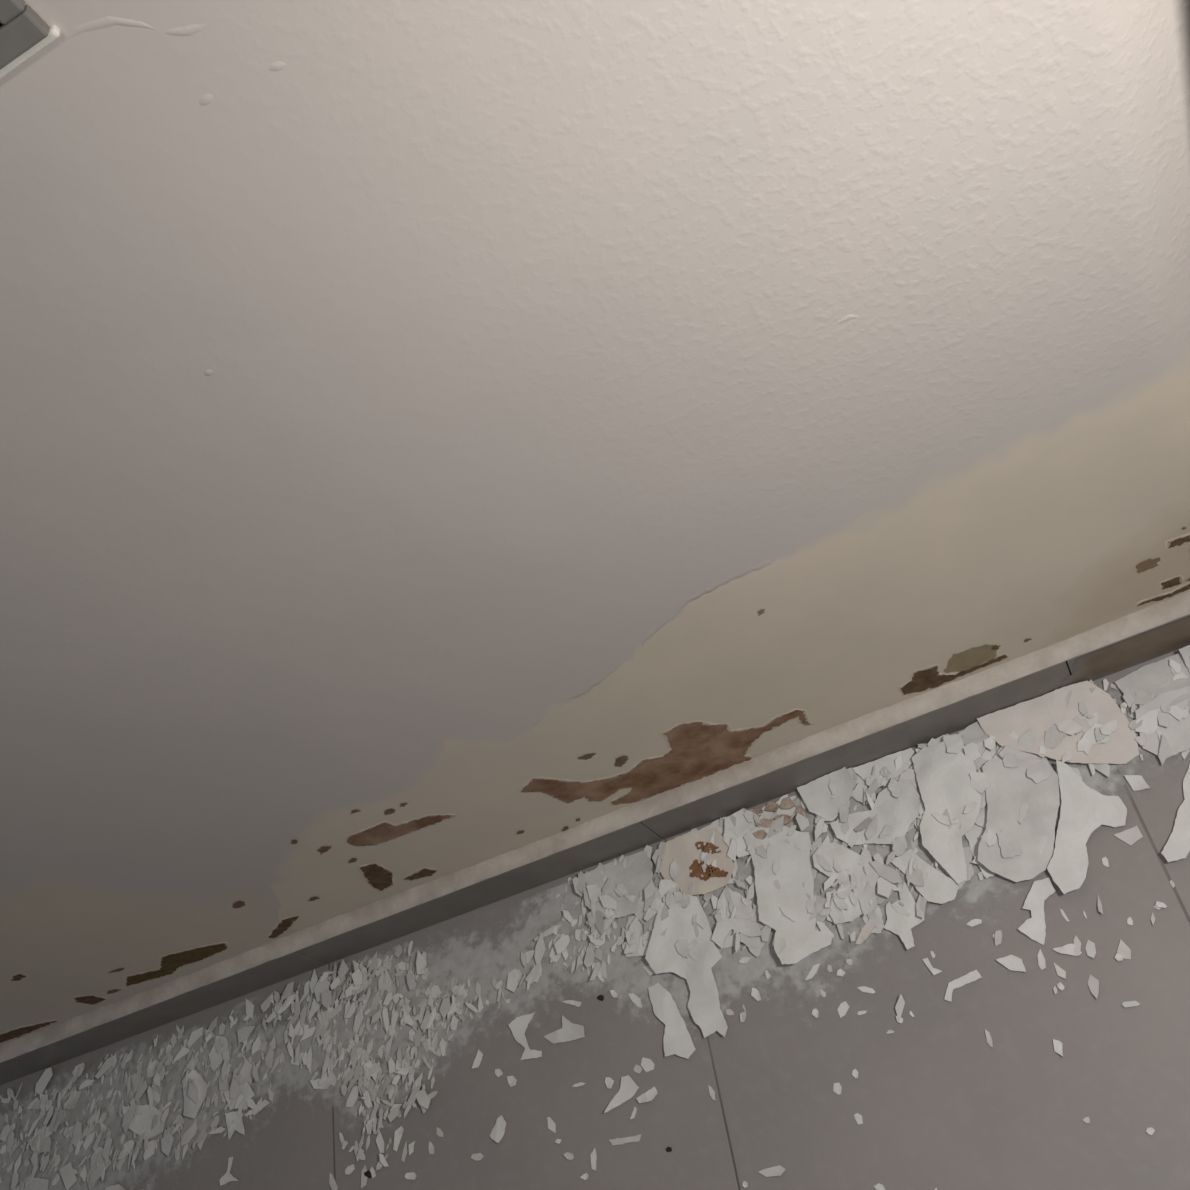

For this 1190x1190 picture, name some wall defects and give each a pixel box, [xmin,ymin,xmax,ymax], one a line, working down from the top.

peeling [72,334,1190,1005]
damp [944,501,1190,673]
spalling [0,1019,60,1043]
damp [0,862,298,1045]